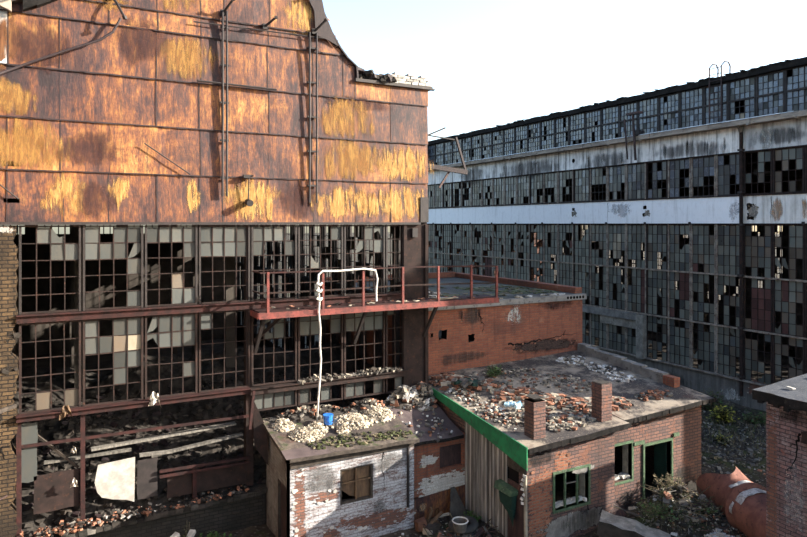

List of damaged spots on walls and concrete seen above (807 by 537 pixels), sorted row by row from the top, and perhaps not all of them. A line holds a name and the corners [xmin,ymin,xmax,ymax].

rust [120,20,166,62]
rust [327,97,383,110]
rust [64,134,114,164]
leakage [663,140,725,157]
leakage [760,129,799,148]
rust [79,184,114,216]
crack [508,333,576,348]
peeling [419,455,439,468]
crack [786,433,801,479]
peeling [414,467,465,498]
peeling [292,468,340,537]
peeling [323,504,417,537]